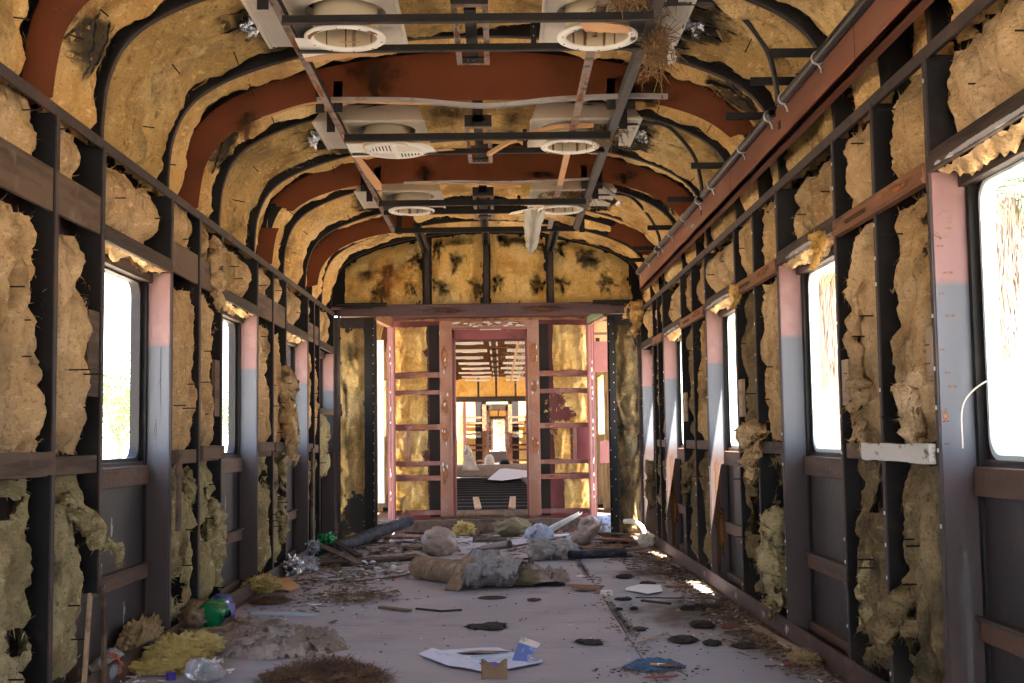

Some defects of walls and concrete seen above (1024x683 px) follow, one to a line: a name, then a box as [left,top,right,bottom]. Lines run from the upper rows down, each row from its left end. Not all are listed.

peeling [934,105,1024,165]
peeling [786,240,811,259]
damp [370,265,417,303]